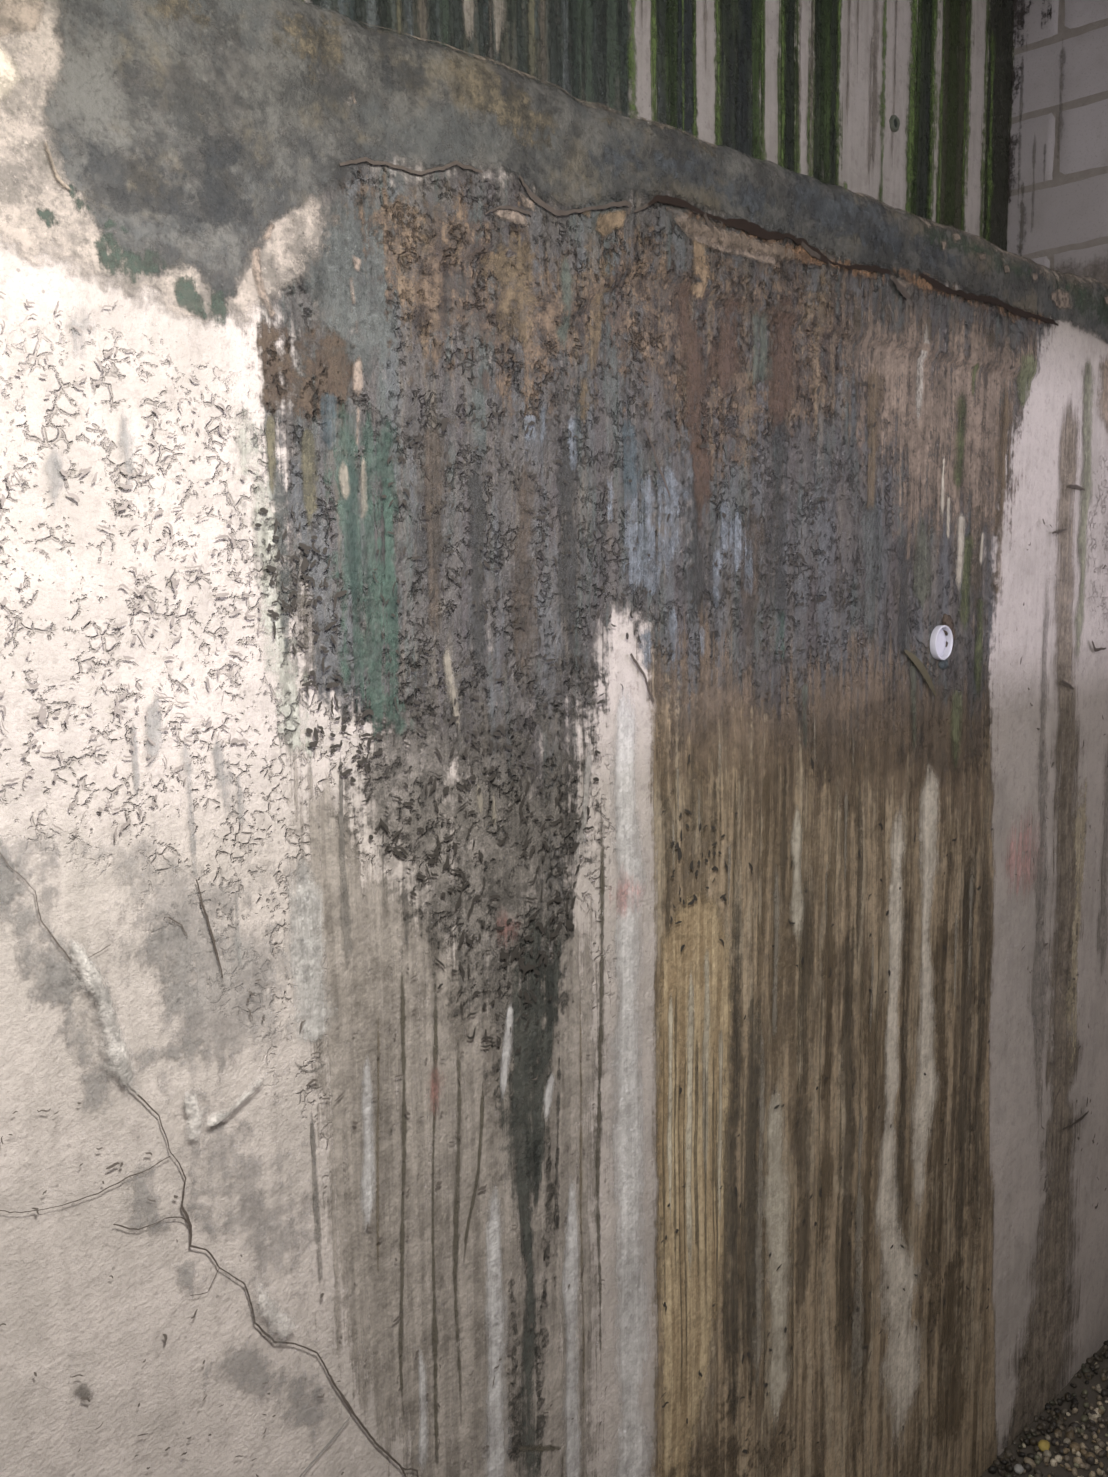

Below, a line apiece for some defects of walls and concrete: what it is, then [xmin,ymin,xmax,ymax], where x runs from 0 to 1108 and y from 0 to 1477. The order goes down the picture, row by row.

leakage [310,0,631,118]
leakage [736,0,753,157]
leakage [752,0,765,159]
leakage [828,0,839,185]
leakage [916,0,937,219]
leakage [938,0,971,231]
spalling [675,213,781,264]
crack [0,853,111,975]
crack [168,879,223,979]
leakage [1003,403,1087,1449]
leakage [612,699,650,1477]
crack [0,1084,419,1477]